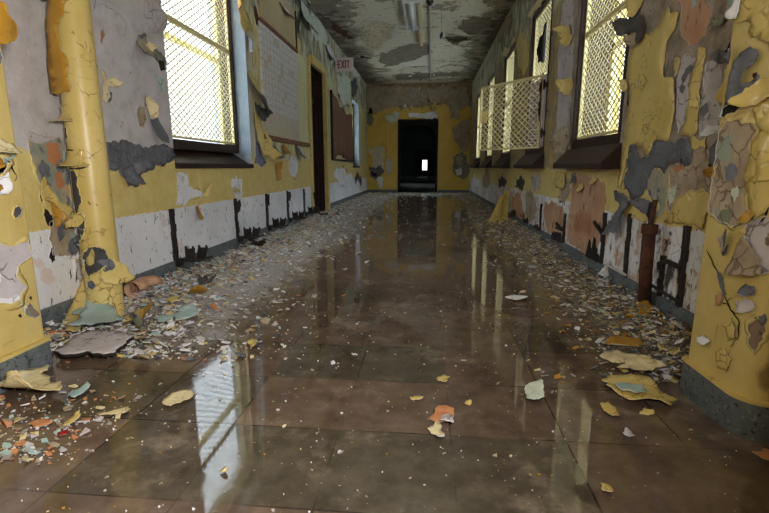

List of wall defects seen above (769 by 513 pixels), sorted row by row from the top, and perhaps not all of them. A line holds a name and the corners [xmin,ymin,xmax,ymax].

peeling [40,0,71,94]
peeling [279,0,354,65]
peeling [360,42,464,82]
peeling [106,0,176,187]
peeling [337,66,360,110]
peeling [385,111,438,123]
peeling [176,171,212,220]
peeling [334,166,355,191]
peeling [367,142,393,189]
peeling [445,0,769,355]
peeling [0,234,41,319]